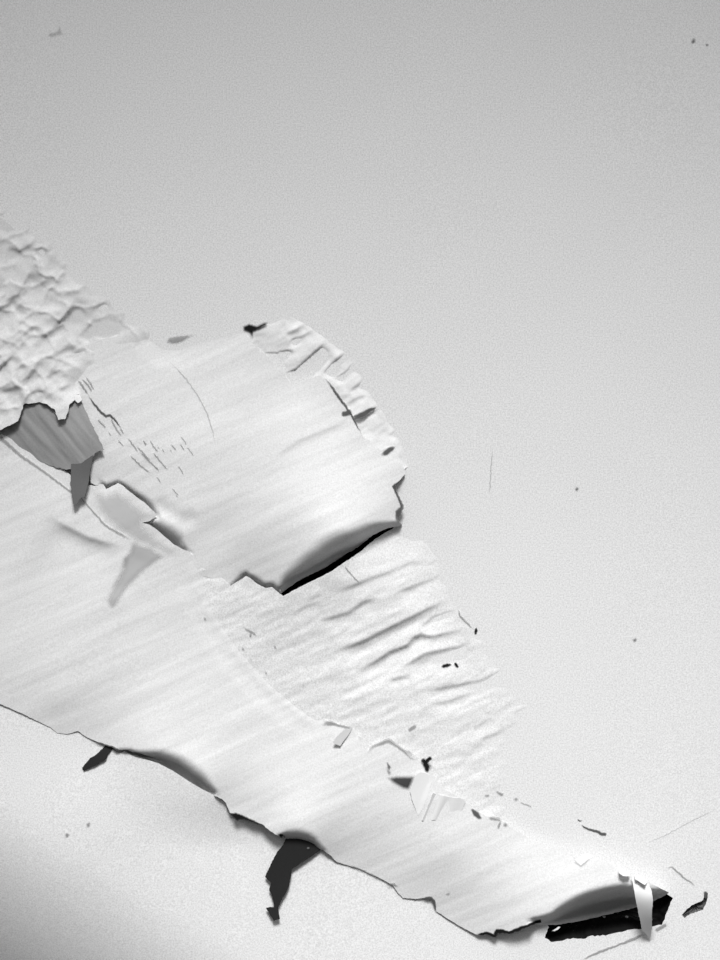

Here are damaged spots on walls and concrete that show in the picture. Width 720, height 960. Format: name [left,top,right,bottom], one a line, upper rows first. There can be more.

peeling [0,314,673,942]
spalling [682,891,708,918]